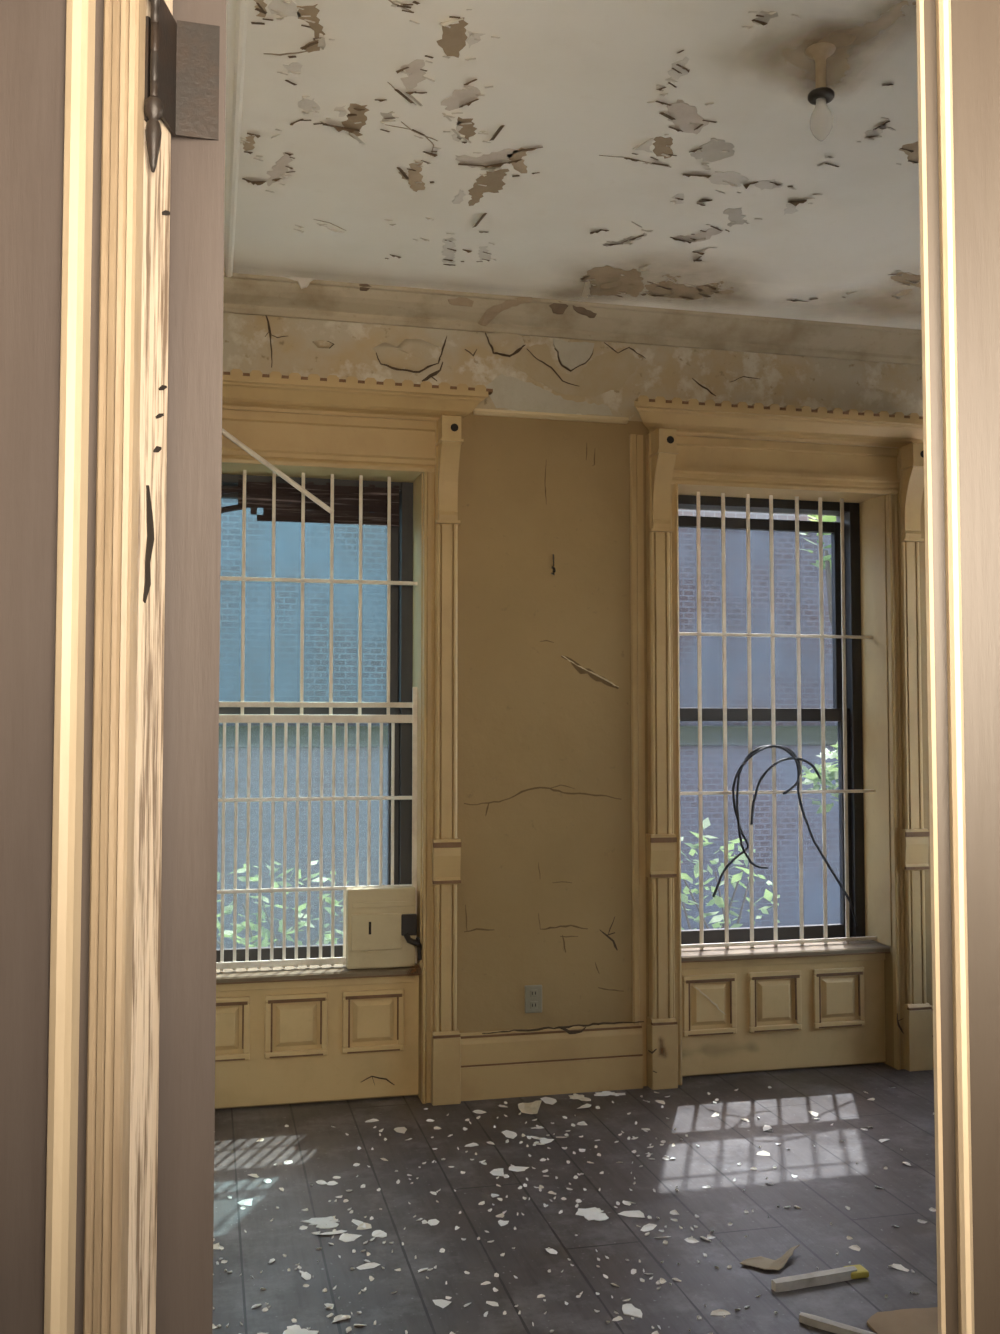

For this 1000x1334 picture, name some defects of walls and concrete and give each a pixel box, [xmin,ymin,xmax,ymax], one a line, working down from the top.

peeling [742,11,801,29]
peeling [240,0,543,266]
peeling [857,117,895,142]
peeling [590,50,823,263]
peeling [896,141,919,165]
peeling [549,264,722,318]
peeling [890,270,921,299]
crack [265,315,286,367]
crack [422,333,578,386]
crack [604,342,646,359]
crack [692,376,758,396]
crack [464,785,619,816]